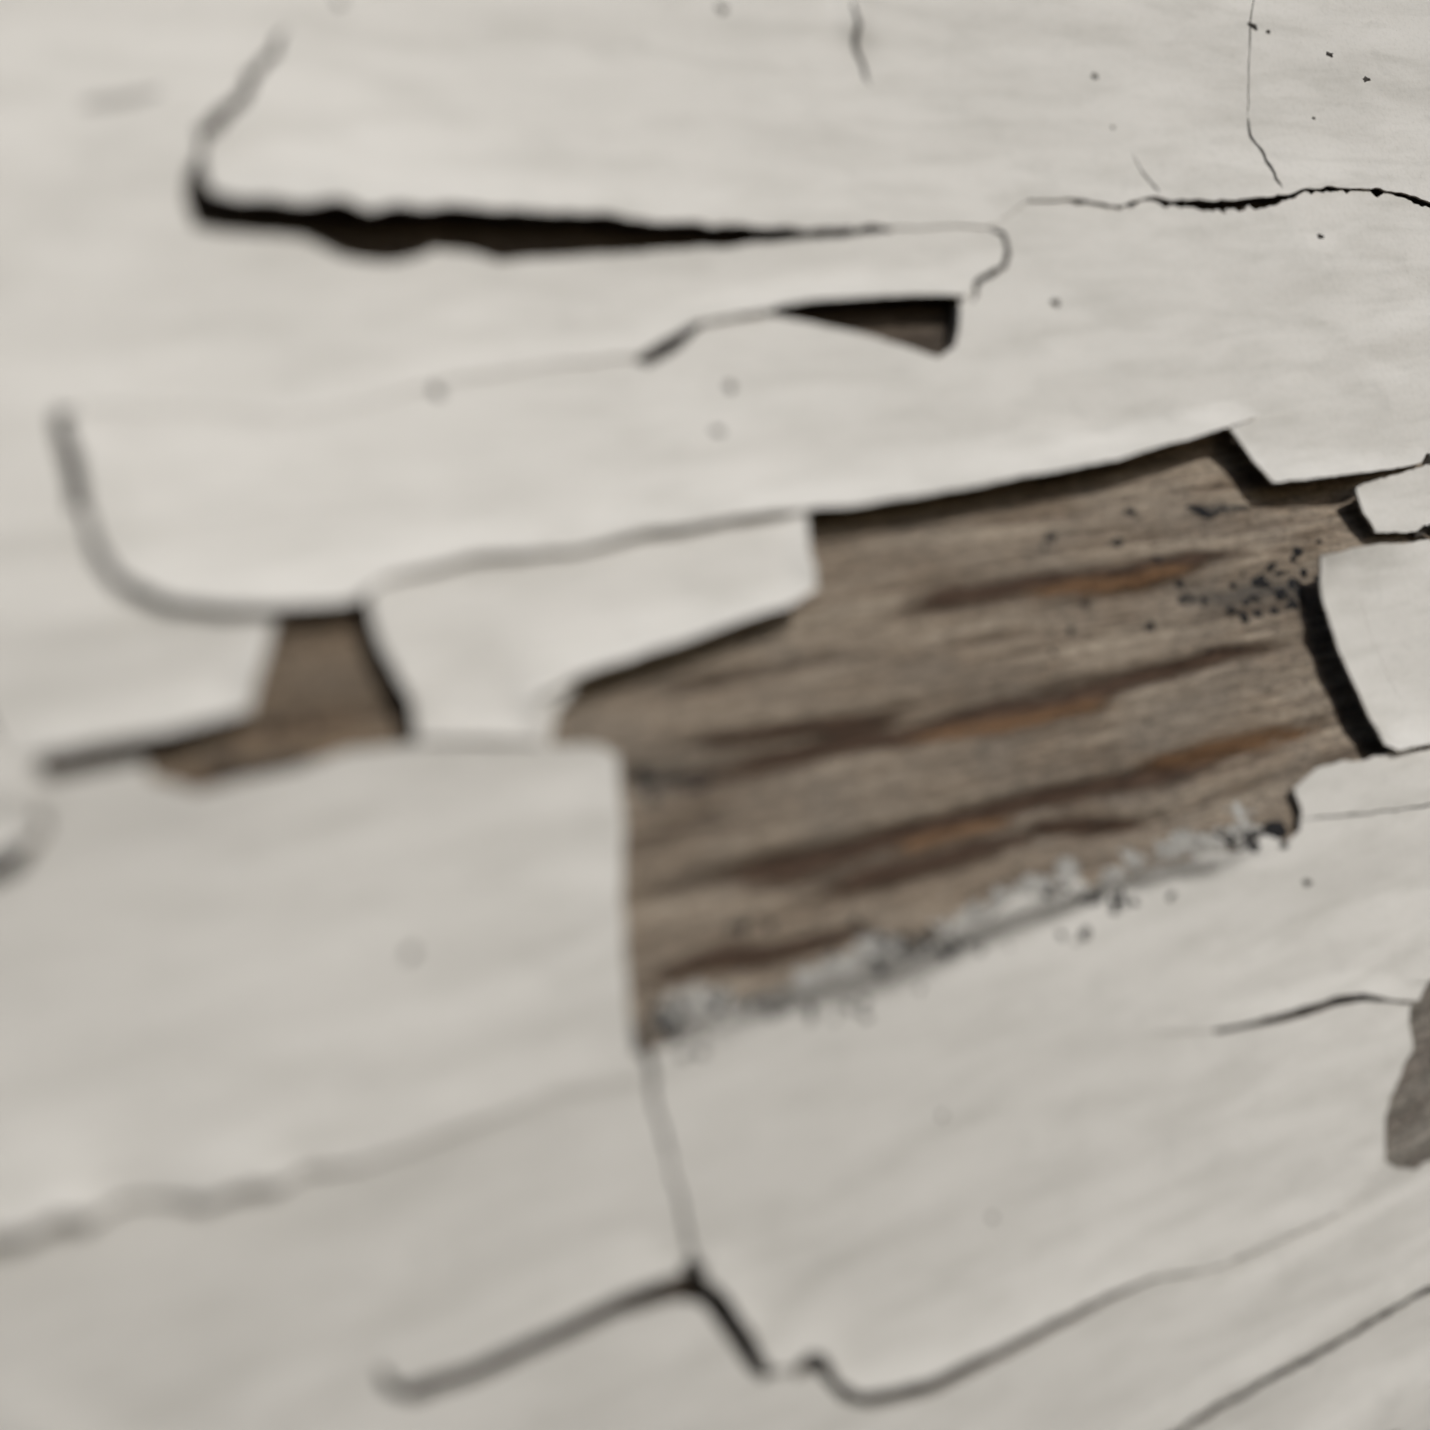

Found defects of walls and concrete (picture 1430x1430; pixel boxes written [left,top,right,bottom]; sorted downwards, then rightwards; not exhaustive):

peeling [203,52,1430,232]
peeling [0,230,1430,1236]
crack [1297,804,1430,821]
peeling [704,969,1430,1394]
peeling [369,1229,684,1387]
peeling [1110,1252,1430,1430]
crack [1181,1286,1430,1430]